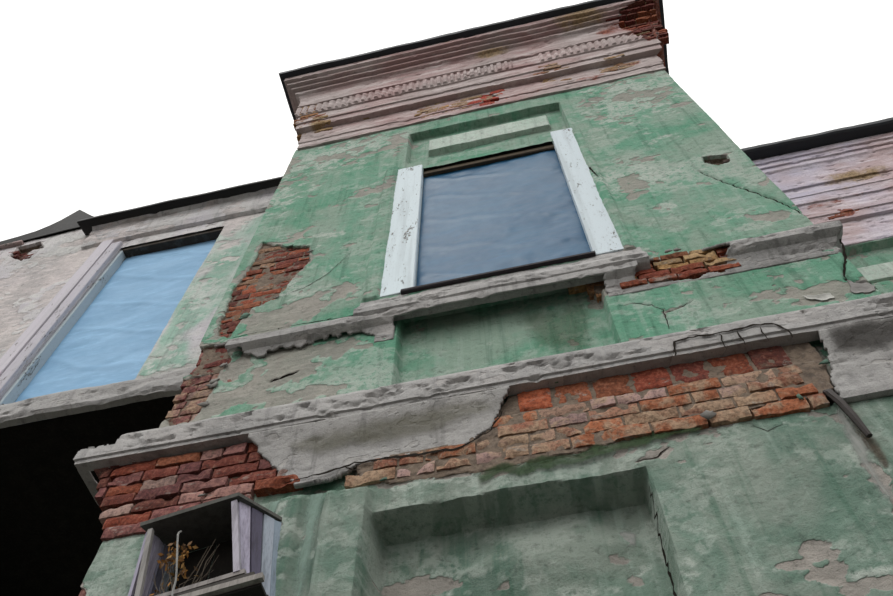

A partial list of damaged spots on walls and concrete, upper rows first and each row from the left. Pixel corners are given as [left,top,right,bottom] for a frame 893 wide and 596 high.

spalling [606,0,670,45]
spalling [411,89,507,119]
crack [700,172,805,216]
spalling [620,247,741,289]
crack [839,239,877,289]
spalling [165,244,314,425]
crack [627,301,793,356]
spalling [344,346,830,489]
spalling [94,442,303,542]